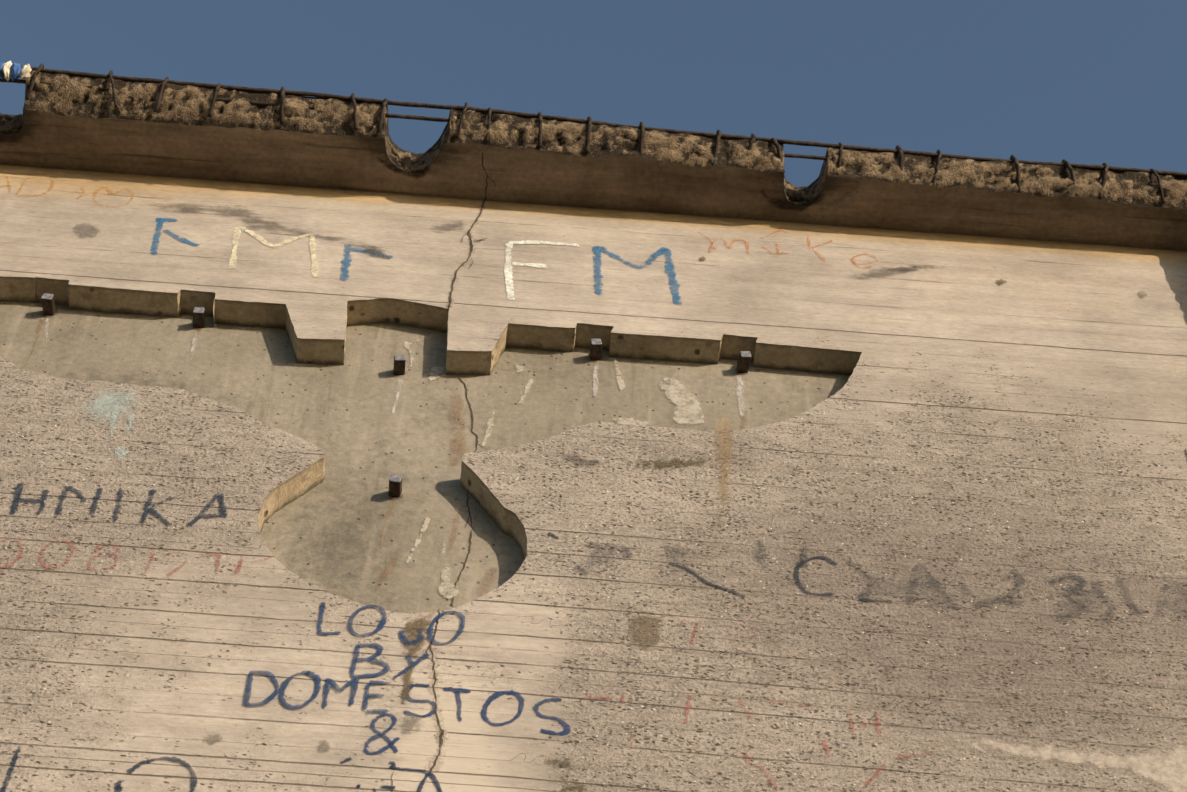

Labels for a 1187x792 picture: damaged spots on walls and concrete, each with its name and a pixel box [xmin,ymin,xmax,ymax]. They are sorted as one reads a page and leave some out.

spalling [0,64,1187,209]
crack [447,153,496,307]
crack [458,378,478,452]
crack [424,492,473,772]